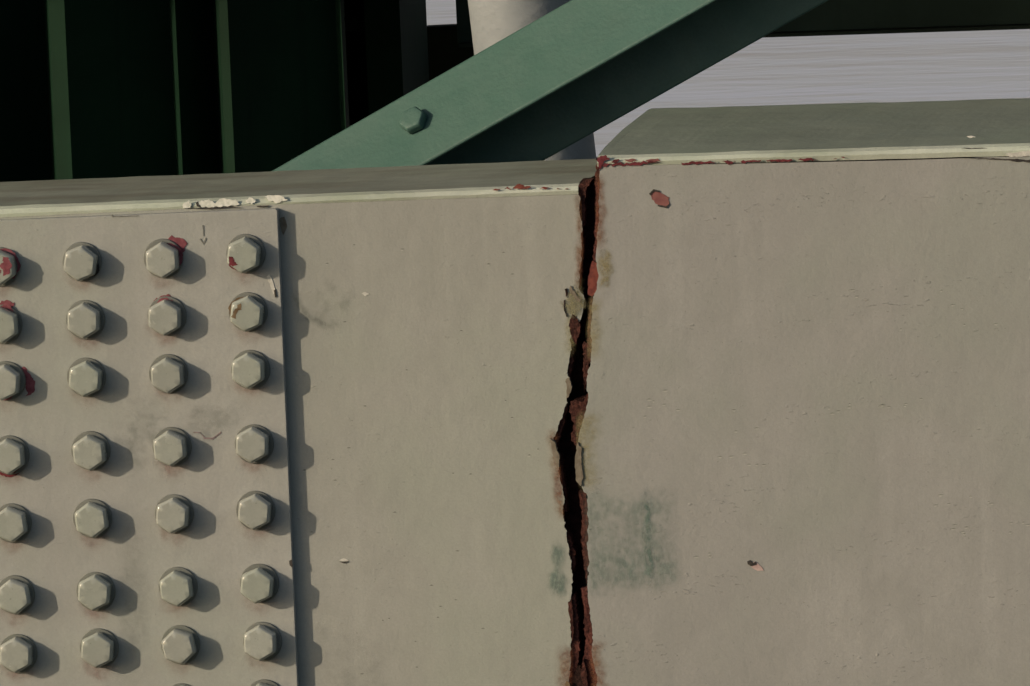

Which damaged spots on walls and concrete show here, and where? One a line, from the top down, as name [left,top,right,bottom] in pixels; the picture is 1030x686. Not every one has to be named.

peeling [597,155,660,170]
peeling [649,189,669,208]
peeling [0,248,21,279]
peeling [167,235,187,265]
peeling [21,367,35,396]
crack [550,157,600,686]